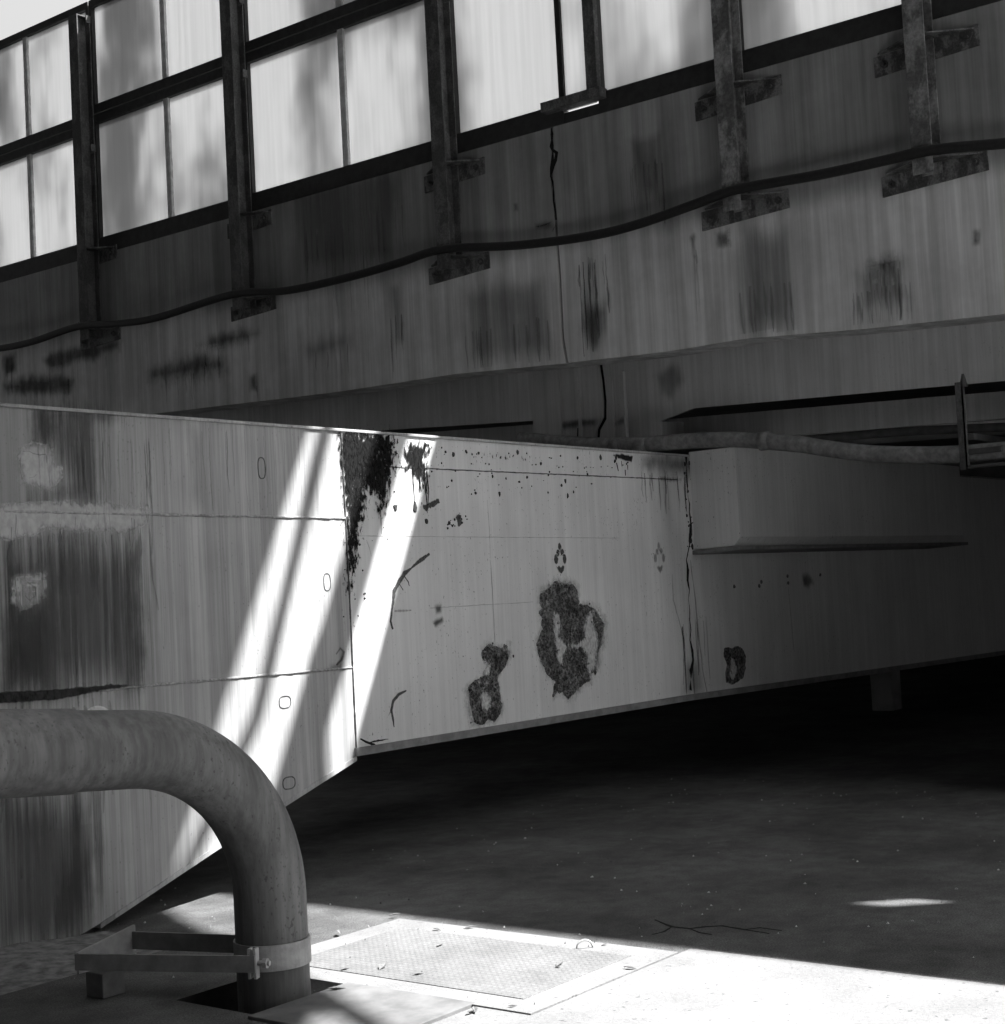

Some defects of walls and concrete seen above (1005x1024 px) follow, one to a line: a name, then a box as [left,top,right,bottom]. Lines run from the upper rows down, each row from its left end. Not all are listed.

crack [537,128,558,227]
leakage [0,411,149,686]
spalling [468,642,514,725]
spalling [536,543,604,700]
spalling [724,646,746,685]
crack [652,919,782,935]